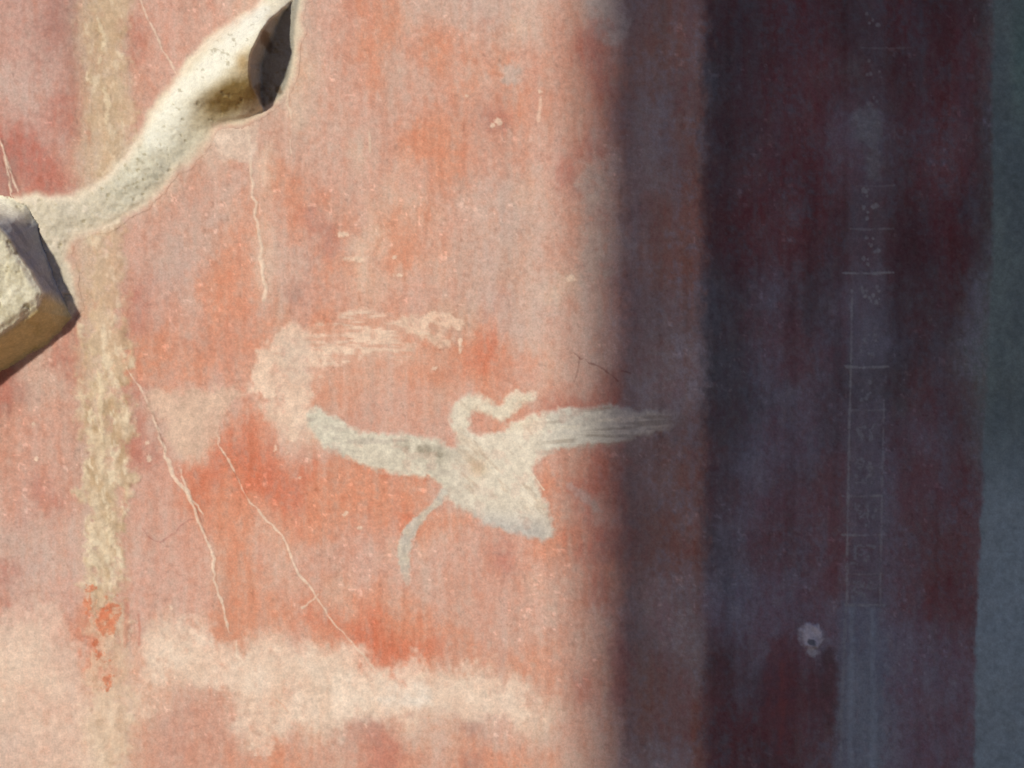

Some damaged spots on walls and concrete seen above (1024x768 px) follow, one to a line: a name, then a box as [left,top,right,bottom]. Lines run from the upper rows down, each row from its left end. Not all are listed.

crack [138,0,177,75]
crack [248,165,269,303]
crack [125,366,231,634]
crack [216,443,353,641]
peeling [0,583,123,768]